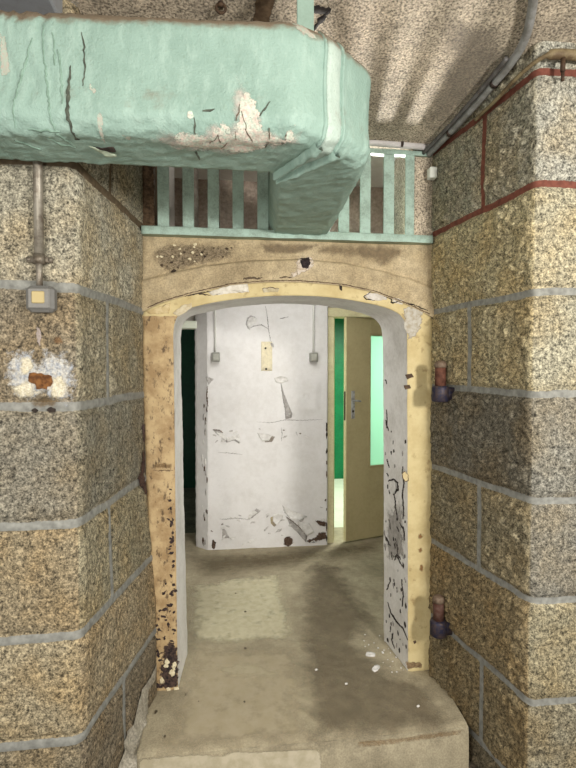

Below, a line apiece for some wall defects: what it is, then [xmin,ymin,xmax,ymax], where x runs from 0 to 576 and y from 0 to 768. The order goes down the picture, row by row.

crack [65,32,86,140]
peeling [161,91,294,154]
peeling [208,284,249,296]
spalling [292,256,314,277]
peeling [363,292,423,339]
peeling [257,428,287,442]
peeling [211,506,327,546]
crack [384,410,408,653]
leakage [203,521,439,731]